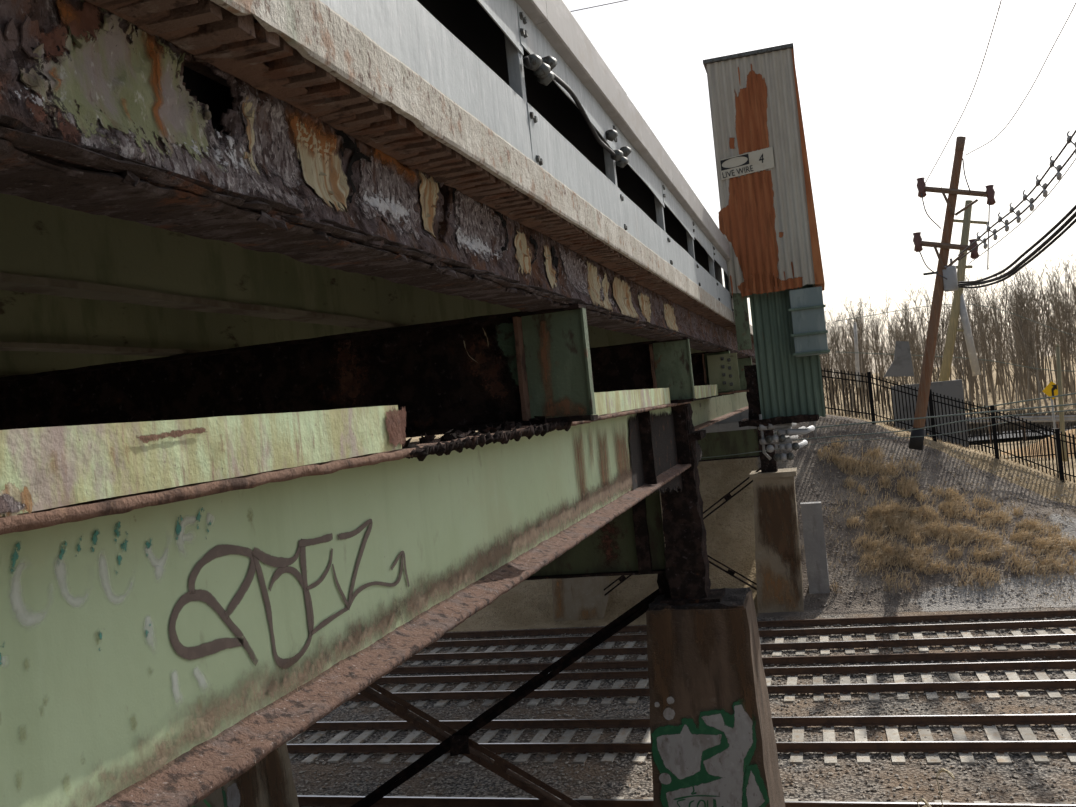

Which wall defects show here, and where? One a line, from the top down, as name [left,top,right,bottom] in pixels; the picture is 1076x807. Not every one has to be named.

peeling [19,8,226,171]
rust [147,39,167,135]
peeling [241,94,260,175]
peeling [296,121,349,213]
peeling [416,171,439,239]
peeling [514,229,557,290]
peeling [587,261,679,332]
rust [729,64,769,154]
rust [718,170,803,297]
rust [330,340,373,408]
rust [104,406,683,793]